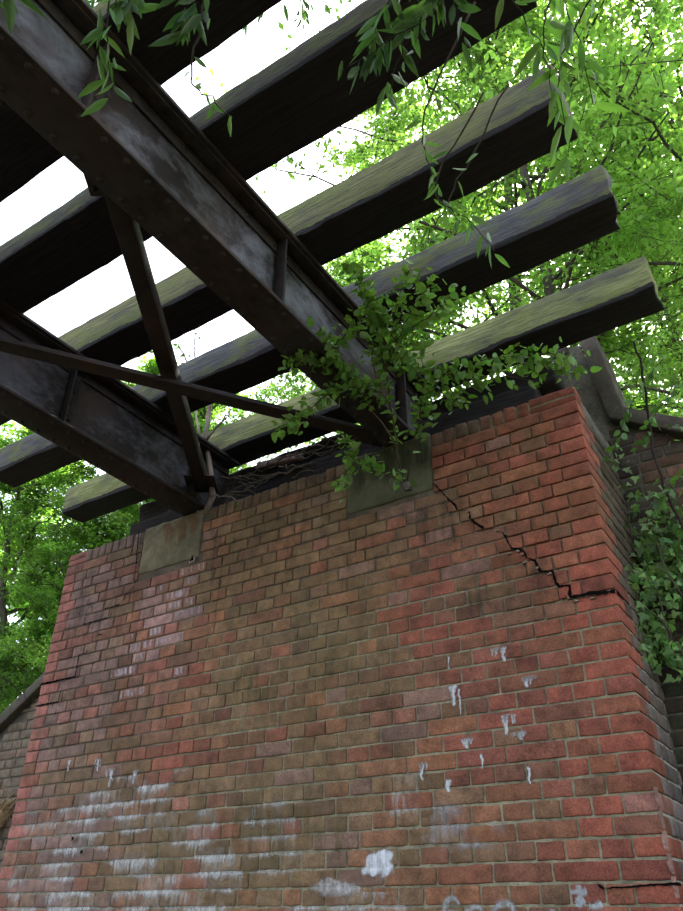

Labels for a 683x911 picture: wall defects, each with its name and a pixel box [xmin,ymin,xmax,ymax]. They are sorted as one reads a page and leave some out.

crack [433,483,629,605]
crack [36,533,139,714]
leakage [449,685,461,714]
leakage [501,714,525,740]
leakage [70,758,167,838]
leakage [196,855,240,878]
leakage [362,849,393,877]
leakage [49,892,89,911]
leakage [128,876,179,897]
leakage [319,878,360,909]
crack [597,882,681,890]